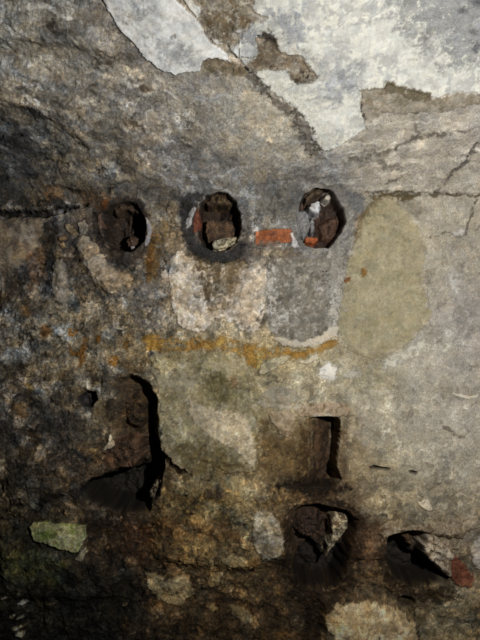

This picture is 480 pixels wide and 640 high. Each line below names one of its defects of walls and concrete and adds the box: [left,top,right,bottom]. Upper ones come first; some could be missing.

peeling [103,0,480,158]
crack [349,131,480,238]
corrosion [142,334,339,368]
crack [165,454,186,474]
spalling [291,416,342,488]
spalling [377,521,480,588]